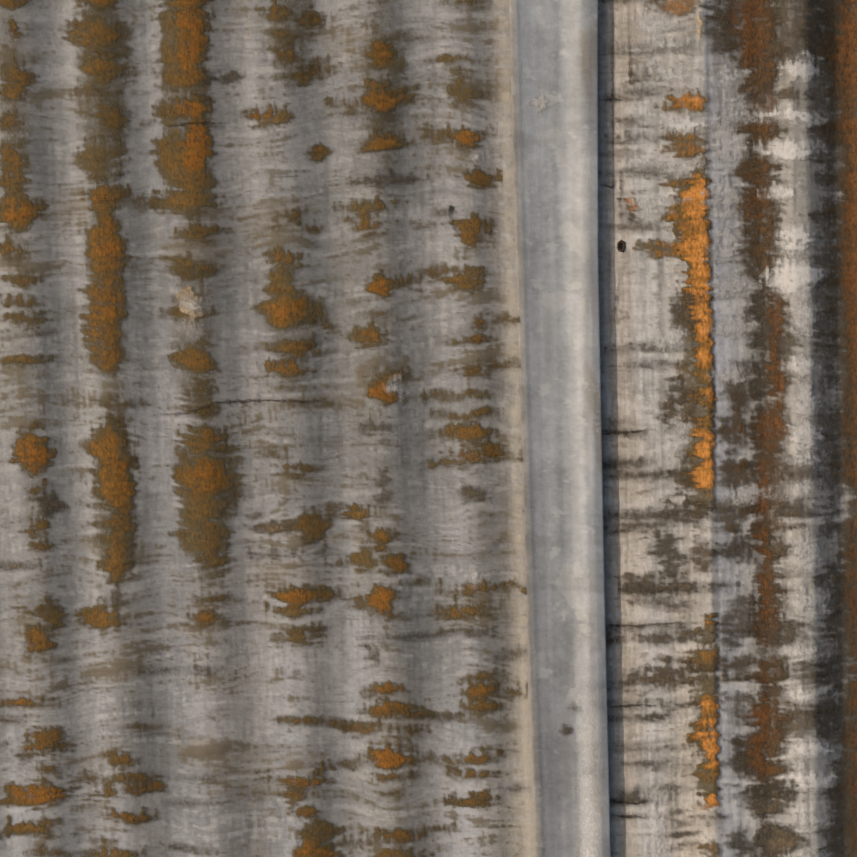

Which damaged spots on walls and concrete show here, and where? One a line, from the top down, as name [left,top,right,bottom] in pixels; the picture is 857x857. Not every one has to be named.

rust [0,143,49,260]
rust [79,395,150,586]
rust [63,0,229,375]
rust [160,303,245,579]
rust [253,245,333,388]
rust [265,502,526,646]
rust [366,263,487,299]
rust [420,388,523,469]
rust [632,0,793,809]
rust [821,0,857,857]
rust [0,725,165,857]
rust [262,680,506,857]